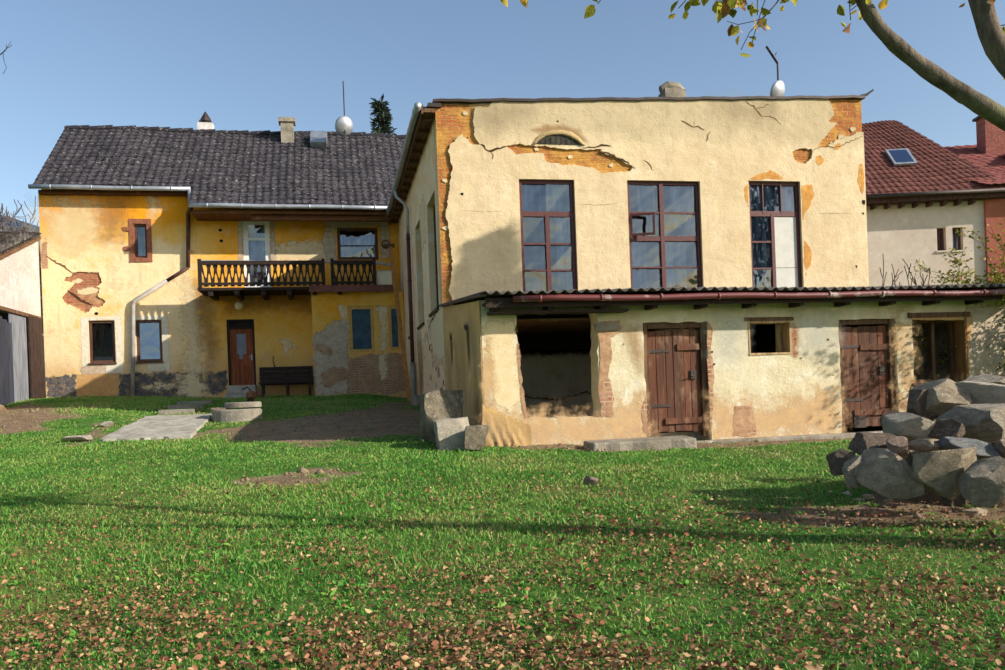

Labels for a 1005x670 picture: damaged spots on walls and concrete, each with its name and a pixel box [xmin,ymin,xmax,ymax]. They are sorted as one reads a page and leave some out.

flaking render [507,144,632,173]
flaking render [744,171,783,207]
flaking render [801,184,814,220]
flaking render [793,99,862,165]
flaking render [427,104,489,370]
flaking render [62,272,105,315]
peeling [45,365,106,398]
peeling [118,275,228,397]
flaking render [346,306,406,395]
flaking render [598,321,624,417]